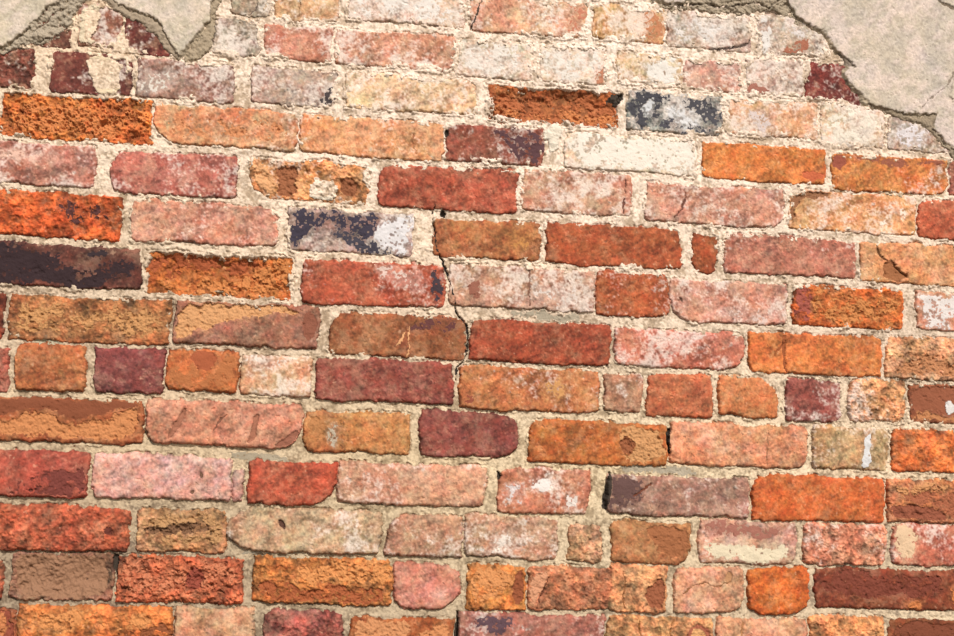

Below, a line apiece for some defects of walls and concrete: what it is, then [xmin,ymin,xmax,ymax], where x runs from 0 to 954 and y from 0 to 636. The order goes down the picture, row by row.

spalling [0,0,88,55]
spalling [651,0,803,25]
spalling [491,94,616,127]
spalling [254,164,298,197]
spalling [790,103,954,220]
spalling [16,253,318,340]
crack [432,204,469,380]
spalling [896,353,954,422]
spalling [0,397,140,441]
spalling [618,425,667,464]
spalling [14,553,110,632]
spalling [645,578,666,609]